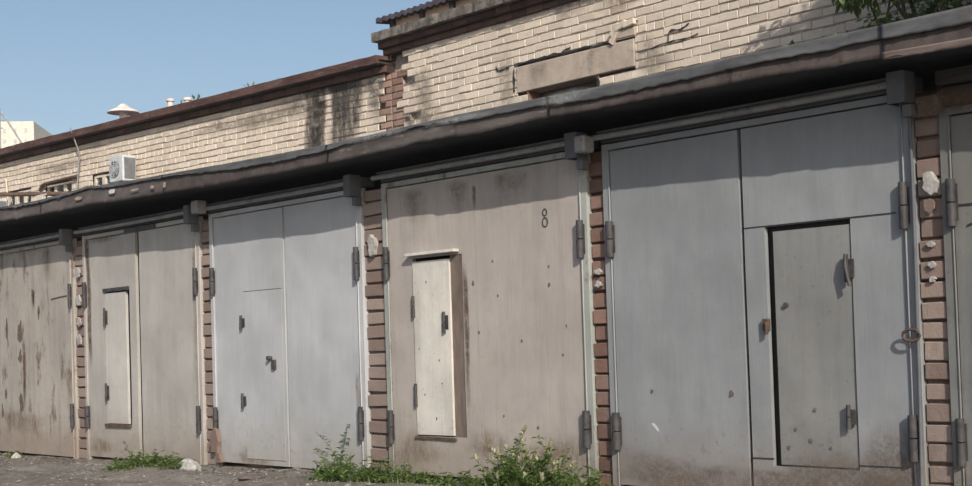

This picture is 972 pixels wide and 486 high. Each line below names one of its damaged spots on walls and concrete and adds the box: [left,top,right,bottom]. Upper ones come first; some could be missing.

crack [638,23,698,53]
leakage [306,76,382,148]
spalling [51,295,82,345]
peeling [5,318,26,413]